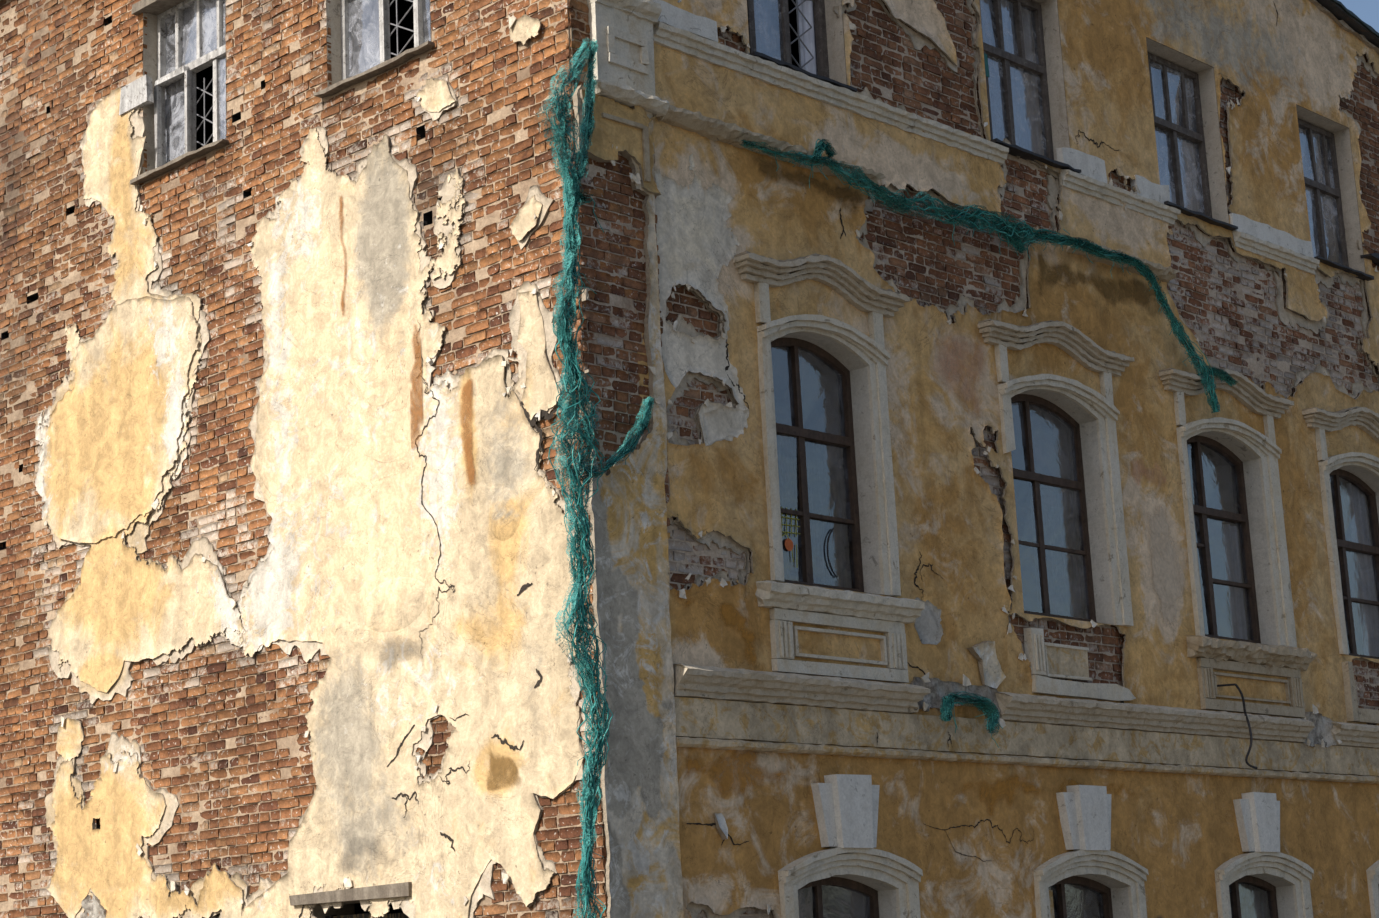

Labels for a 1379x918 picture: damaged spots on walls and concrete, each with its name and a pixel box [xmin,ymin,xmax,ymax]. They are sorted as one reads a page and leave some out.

peeling [414,77,458,140]
spalling [833,0,988,139]
spalling [855,138,1063,325]
spalling [1167,55,1379,399]
peeling [19,87,752,918]
spalling [954,426,1124,707]
crack [387,713,524,818]
crack [440,832,455,852]
spalling [686,902,774,918]
crack [925,819,1034,862]